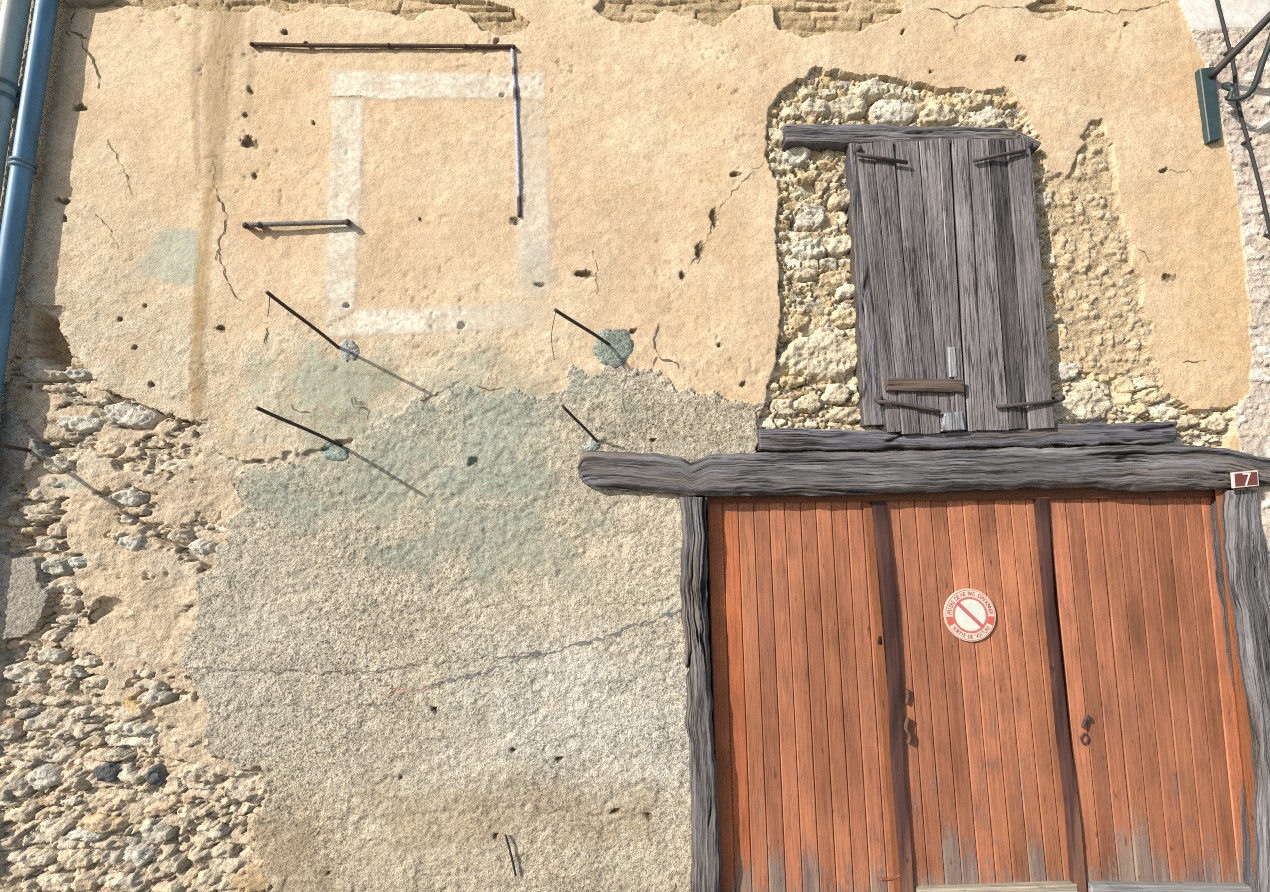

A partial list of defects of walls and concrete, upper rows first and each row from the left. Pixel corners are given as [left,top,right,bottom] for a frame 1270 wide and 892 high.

spalling [91,0,530,44]
spalling [594,0,906,38]
crack [930,5,1025,31]
spalling [1026,0,1083,20]
crack [1068,1,1169,14]
crack [212,155,241,301]
crack [685,167,759,274]
spalling [759,66,1242,449]
spalling [0,293,353,892]
crack [121,609,681,697]